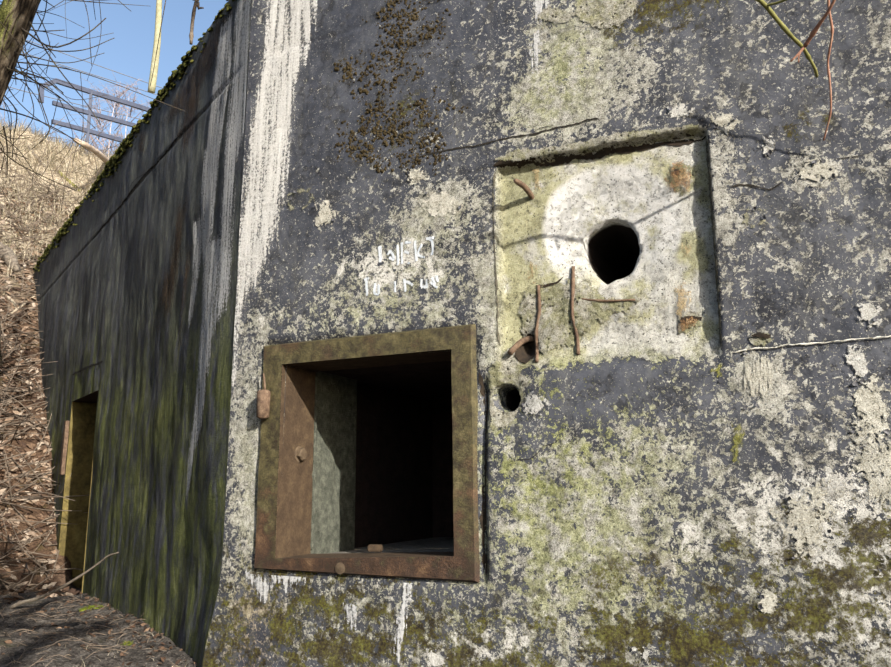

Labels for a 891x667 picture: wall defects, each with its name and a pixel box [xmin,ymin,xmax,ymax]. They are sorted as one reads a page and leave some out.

spalling [487,275,647,432]
crack [417,117,891,353]
corrosion [664,160,691,191]
corrosion [675,283,698,331]